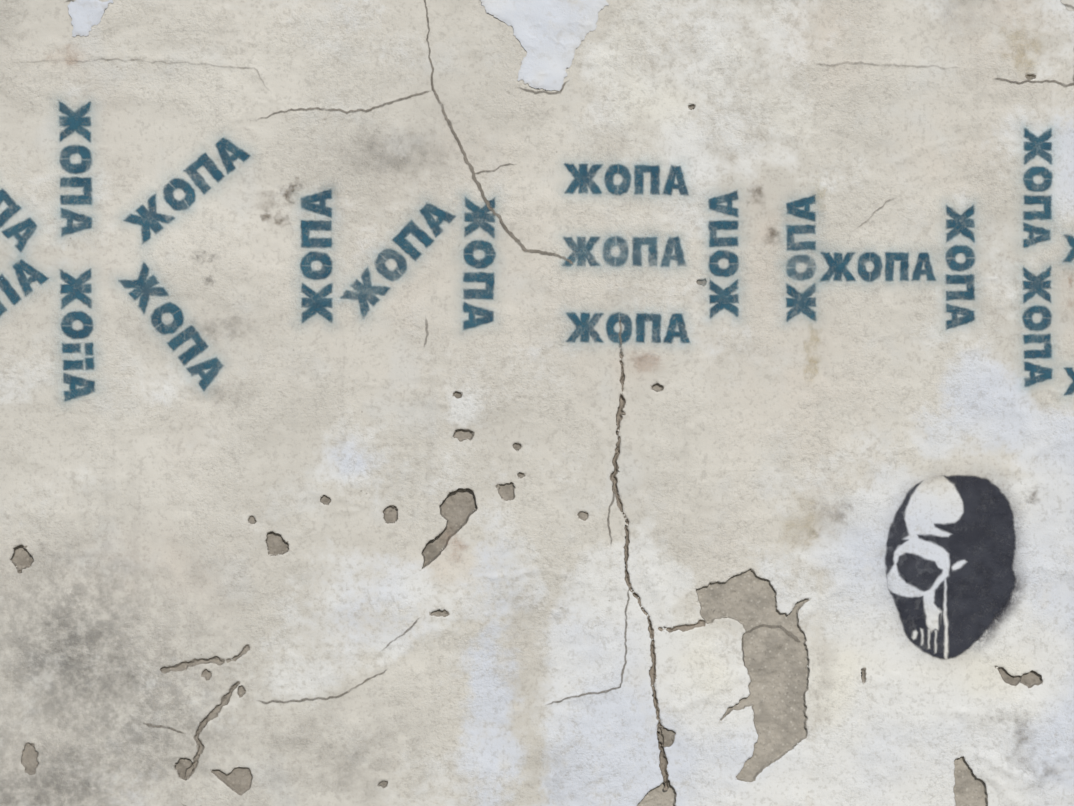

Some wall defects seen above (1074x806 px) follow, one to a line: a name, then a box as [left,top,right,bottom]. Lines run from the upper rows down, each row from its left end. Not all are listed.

peeling [68,0,113,37]
peeling [480,0,609,91]
crack [996,76,1074,86]
crack [268,0,573,264]
flaking render [421,488,478,569]
crack [551,320,677,806]
crack [147,644,382,781]
flaking render [658,569,811,782]
flaking render [995,666,1043,688]
flaking render [953,756,988,806]